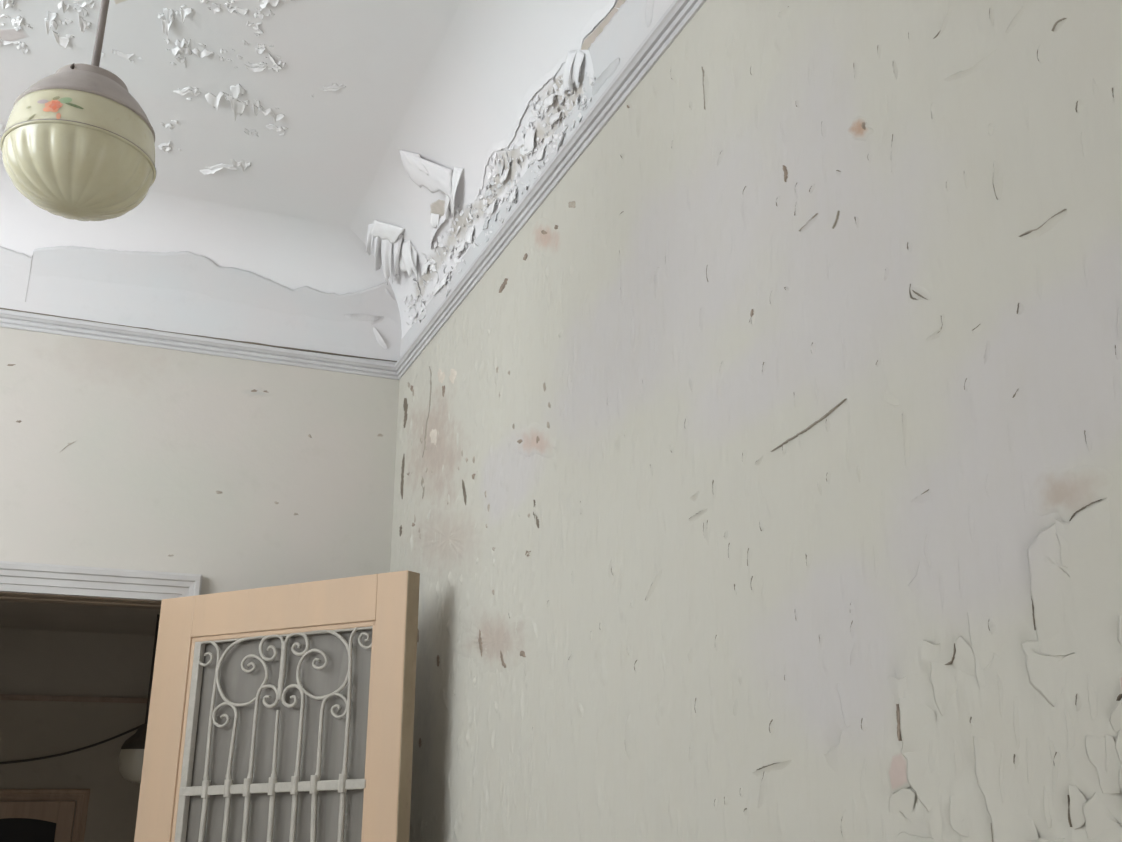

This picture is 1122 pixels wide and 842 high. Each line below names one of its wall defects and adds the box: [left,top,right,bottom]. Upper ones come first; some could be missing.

peeling [0,0,674,353]
peeling [1068,785,1122,839]